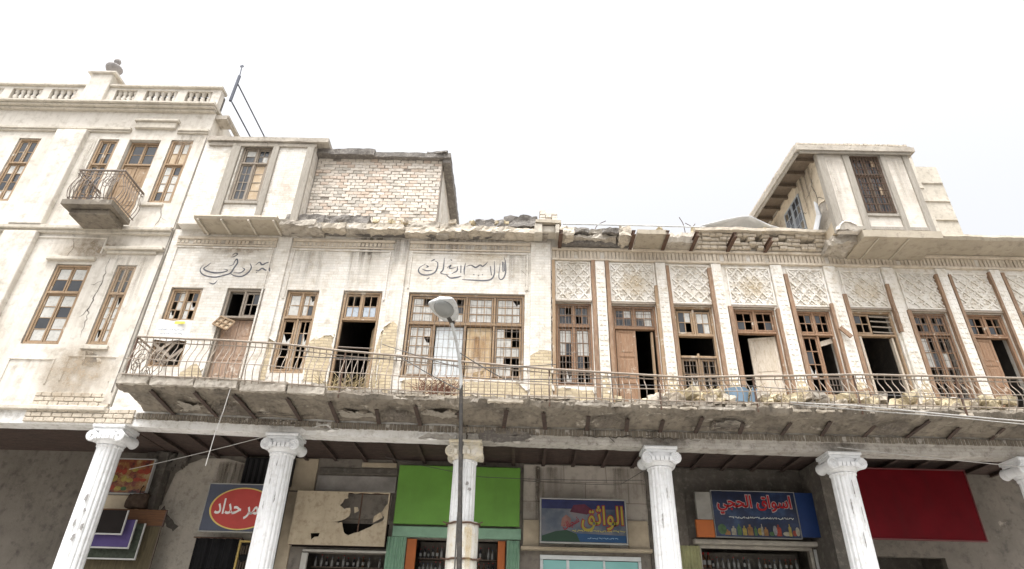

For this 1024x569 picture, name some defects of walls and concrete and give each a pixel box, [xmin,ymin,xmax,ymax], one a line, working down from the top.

crack [81,257,111,333]
spalling [177,401,205,412]
spalling [301,334,335,384]
spalling [340,321,974,441]